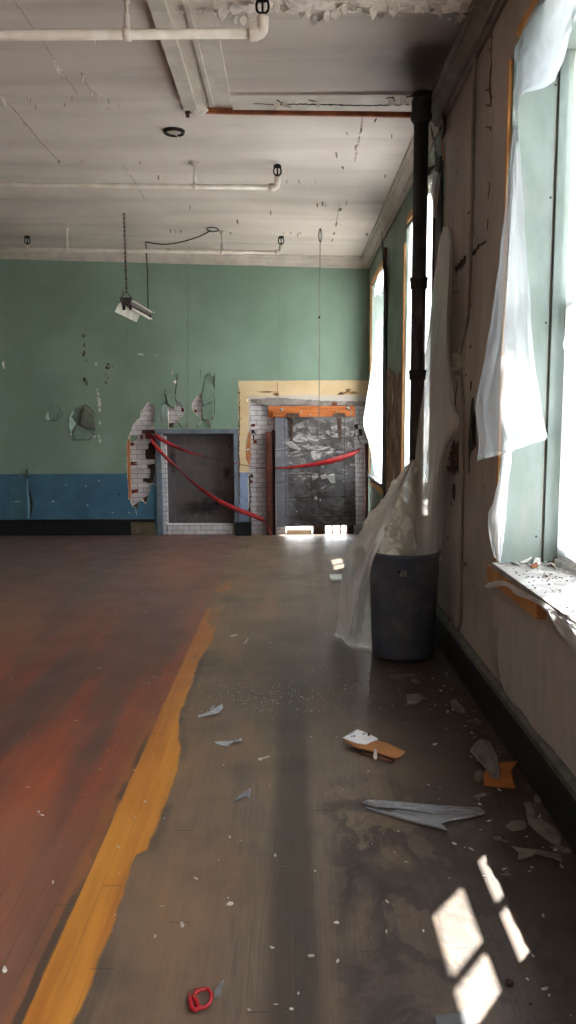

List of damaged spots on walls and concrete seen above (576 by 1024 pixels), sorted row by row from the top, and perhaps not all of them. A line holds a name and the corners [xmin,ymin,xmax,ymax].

peeling [179,0,474,26]
crack [190,103,208,117]
crack [254,93,414,169]
peeling [46,334,113,443]
spalling [118,367,215,515]